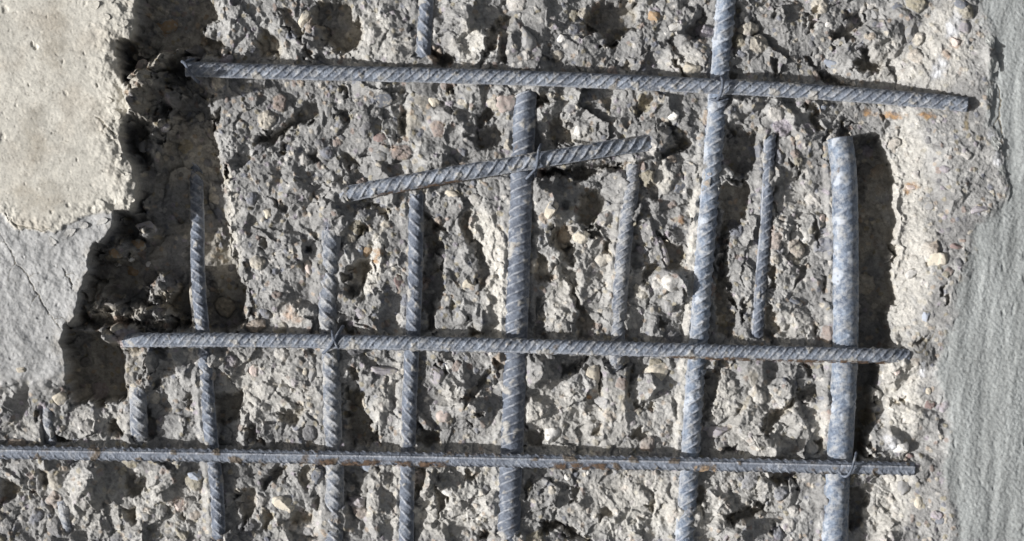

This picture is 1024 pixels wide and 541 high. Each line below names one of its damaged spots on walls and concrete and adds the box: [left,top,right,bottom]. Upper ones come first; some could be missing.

spalling [0,0,721,452]
spalling [0,445,853,541]
spalling [336,0,1009,541]